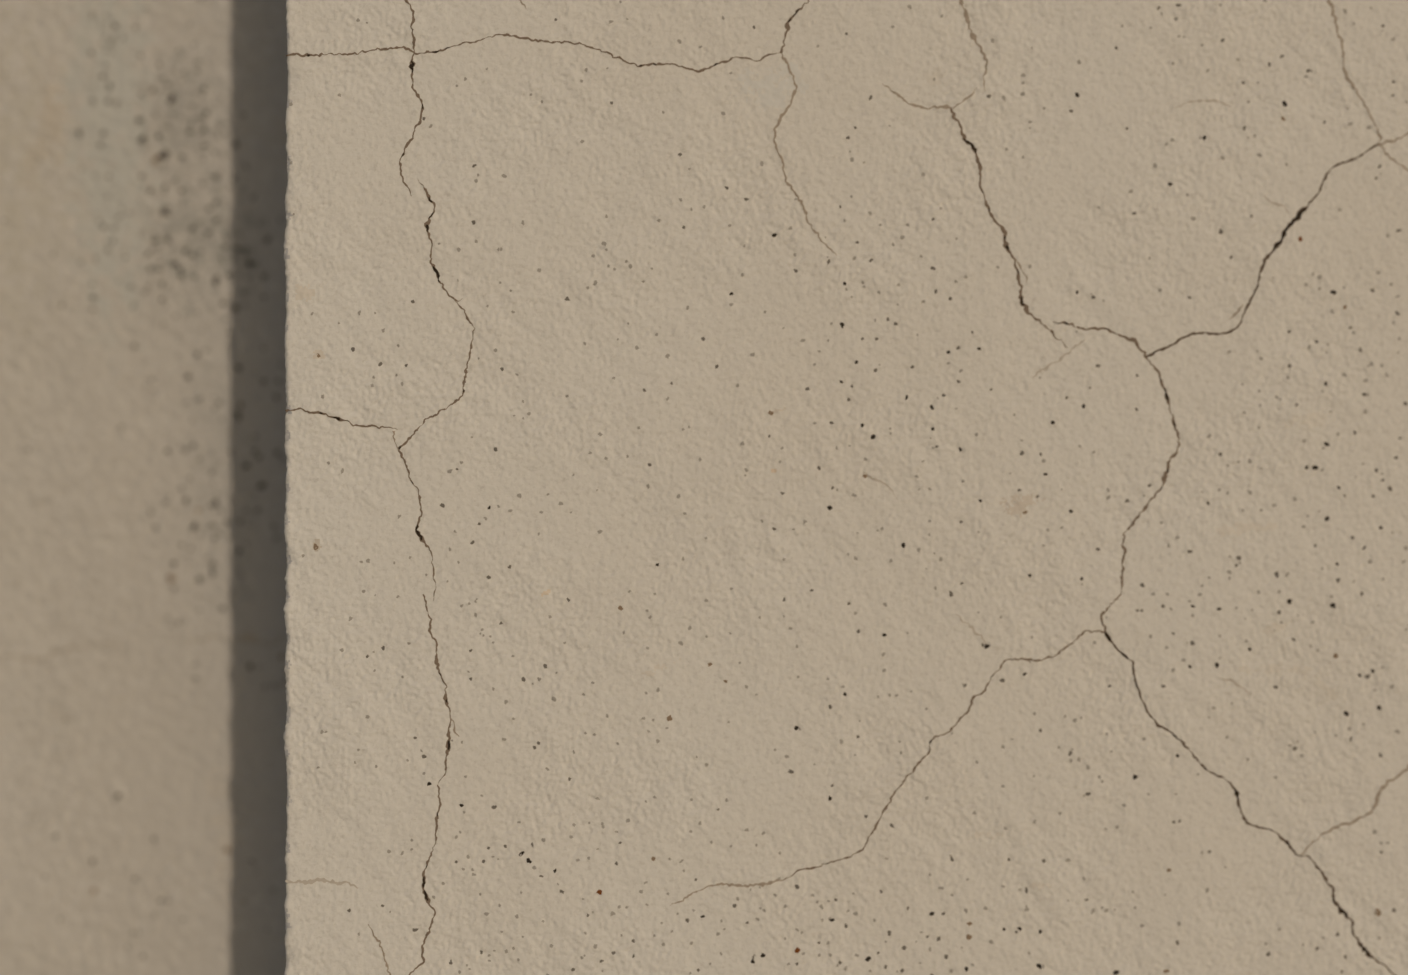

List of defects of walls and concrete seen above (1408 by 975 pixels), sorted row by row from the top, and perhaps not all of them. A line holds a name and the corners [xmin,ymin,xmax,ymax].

damp [0,0,305,975]
crack [285,0,837,975]
crack [671,0,1408,975]